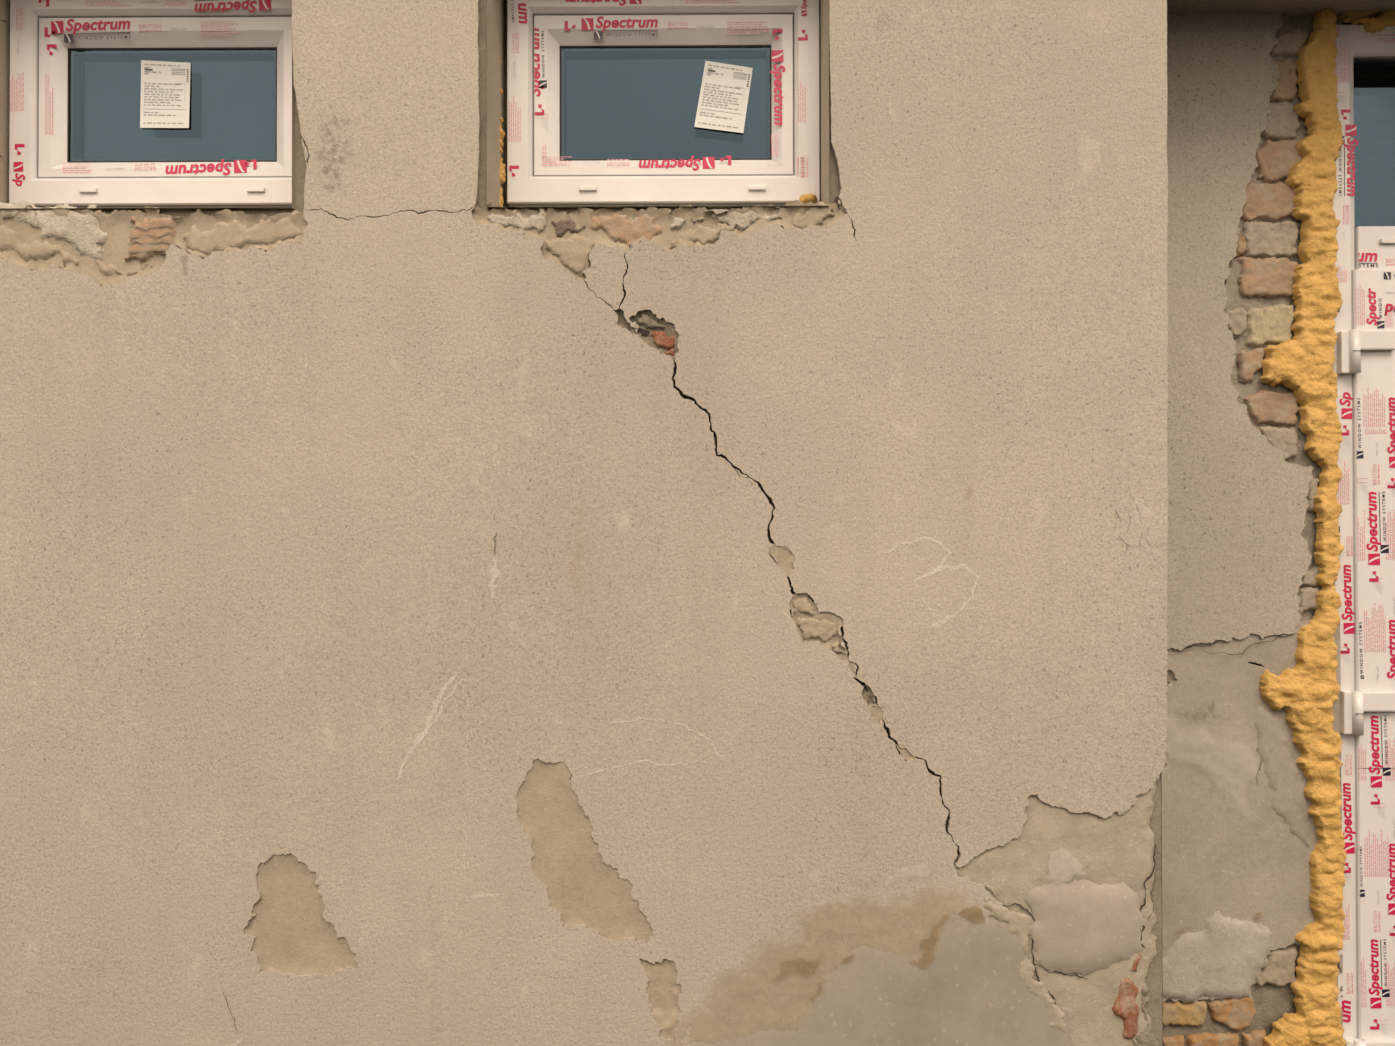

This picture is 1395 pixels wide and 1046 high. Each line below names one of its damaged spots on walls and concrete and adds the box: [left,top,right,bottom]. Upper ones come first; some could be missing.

flaking render [0,201,308,287]
flaking render [472,200,847,280]
crack [585,259,650,336]
flaking render [1224,16,1322,621]
crack [672,362,959,862]
flaking render [1167,670,1178,686]
crack [1167,634,1294,666]
flaking render [516,759,653,942]
flaking render [244,853,358,976]
flaking render [954,772,1301,1046]
flaking render [640,959,681,1042]